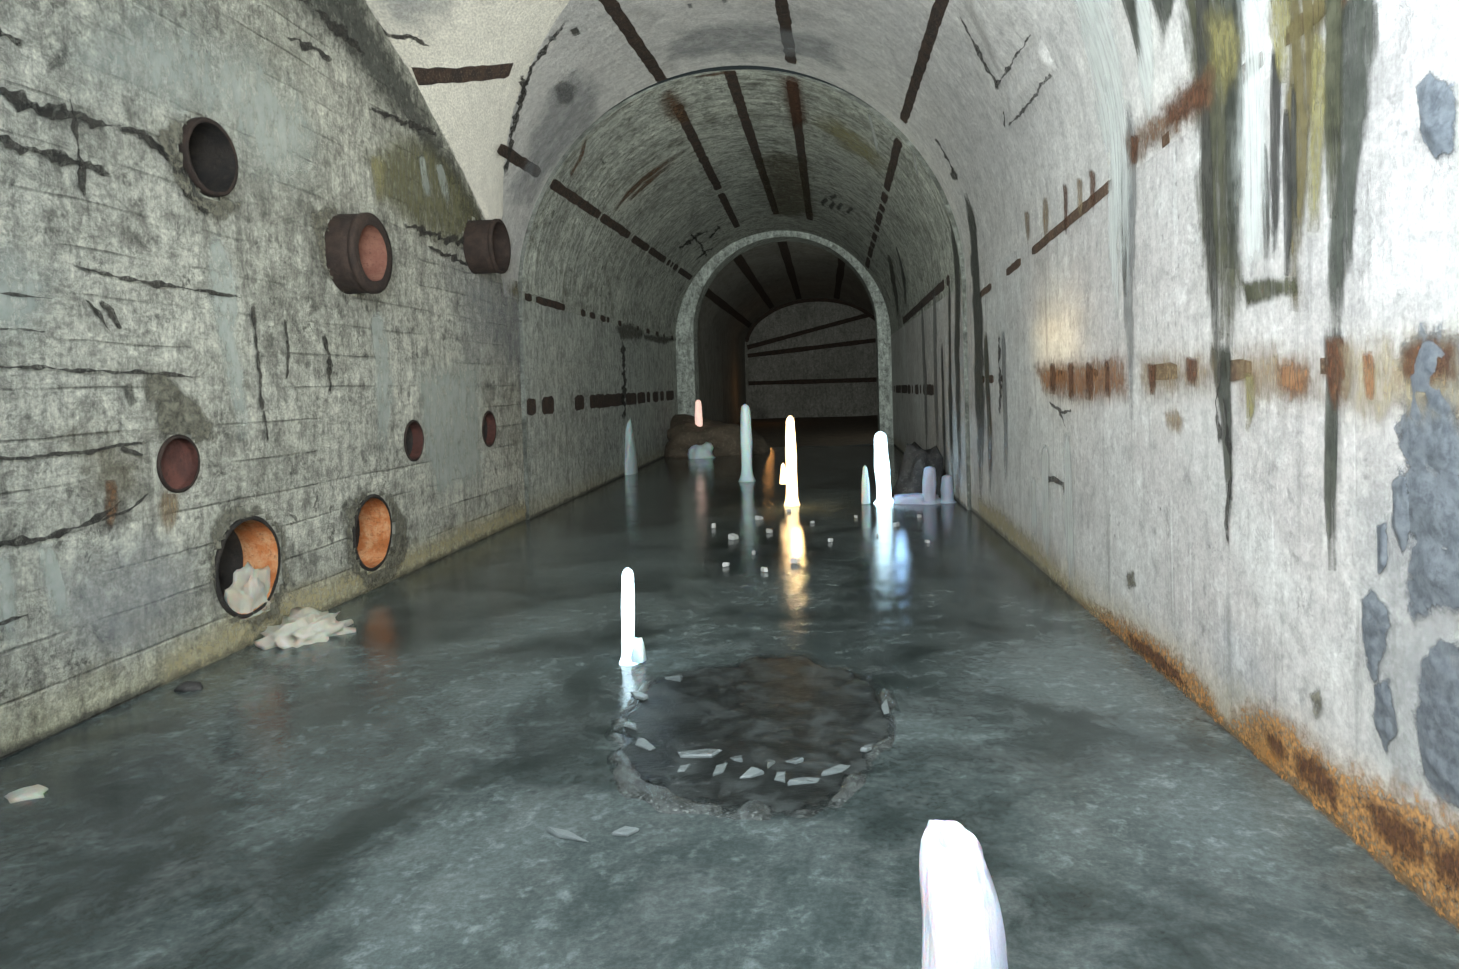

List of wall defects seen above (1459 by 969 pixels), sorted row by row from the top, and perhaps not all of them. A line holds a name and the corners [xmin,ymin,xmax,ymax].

crack [0,28,23,46]
crack [0,87,220,215]
rust [1126,65,1213,165]
rust [1241,51,1263,84]
rust [980,170,1114,298]
damp [1076,0,1377,489]
rust [1034,356,1211,400]
damp [1324,333,1341,547]
crack [0,493,148,547]
peeling [1361,323,1459,752]
rust [1082,601,1459,927]
peeling [1415,640,1459,808]